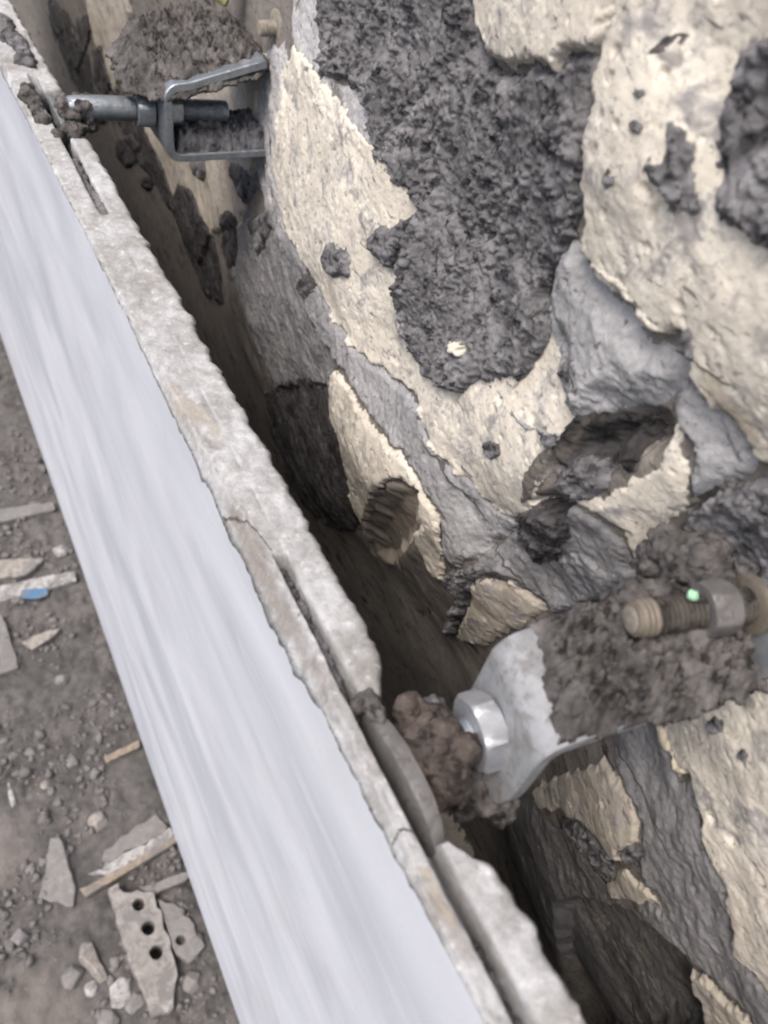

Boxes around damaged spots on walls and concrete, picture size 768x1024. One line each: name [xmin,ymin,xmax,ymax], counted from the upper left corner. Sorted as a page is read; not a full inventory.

spalling [632,413,676,472]
spalling [520,447,567,503]
crack [223,516,272,551]